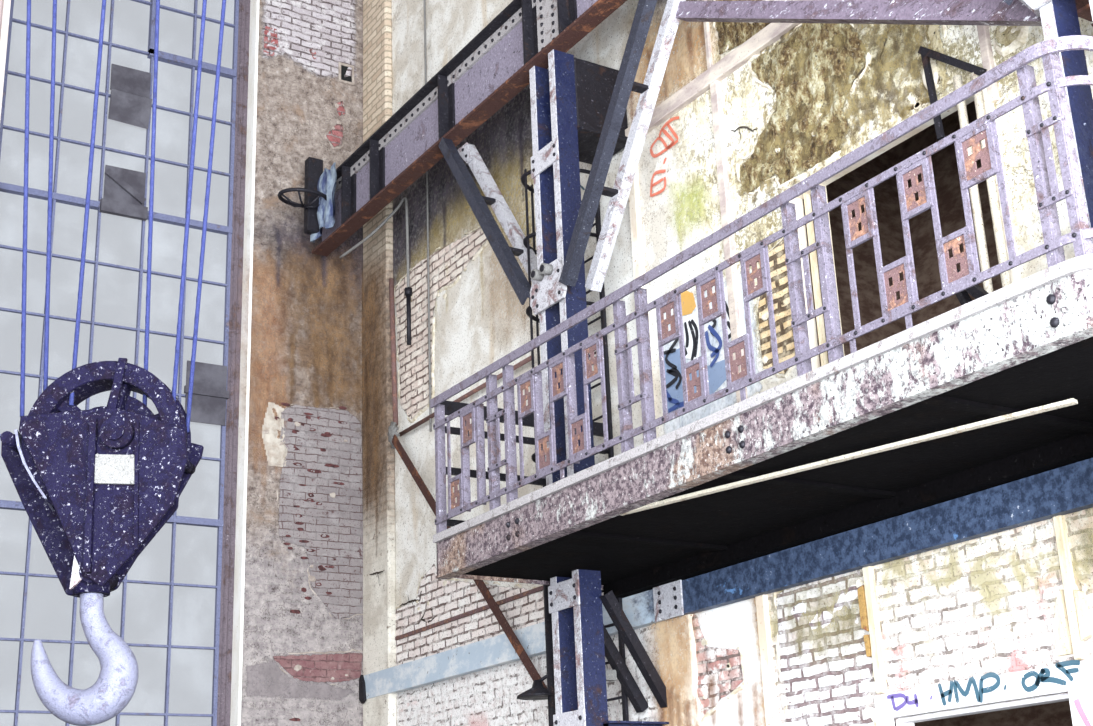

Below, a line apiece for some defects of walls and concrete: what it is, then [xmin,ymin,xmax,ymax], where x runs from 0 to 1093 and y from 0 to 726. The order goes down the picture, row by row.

flaking render [263,0,356,77]
spalling [712,22,770,57]
spalling [736,23,872,196]
spalling [899,25,952,115]
peeling [993,26,1029,57]
leakage [277,231,384,516]
spalling [394,226,489,423]
spalling [262,402,363,619]
corrosion [654,616,700,726]
spalling [692,615,749,726]
corrosion [738,682,766,726]